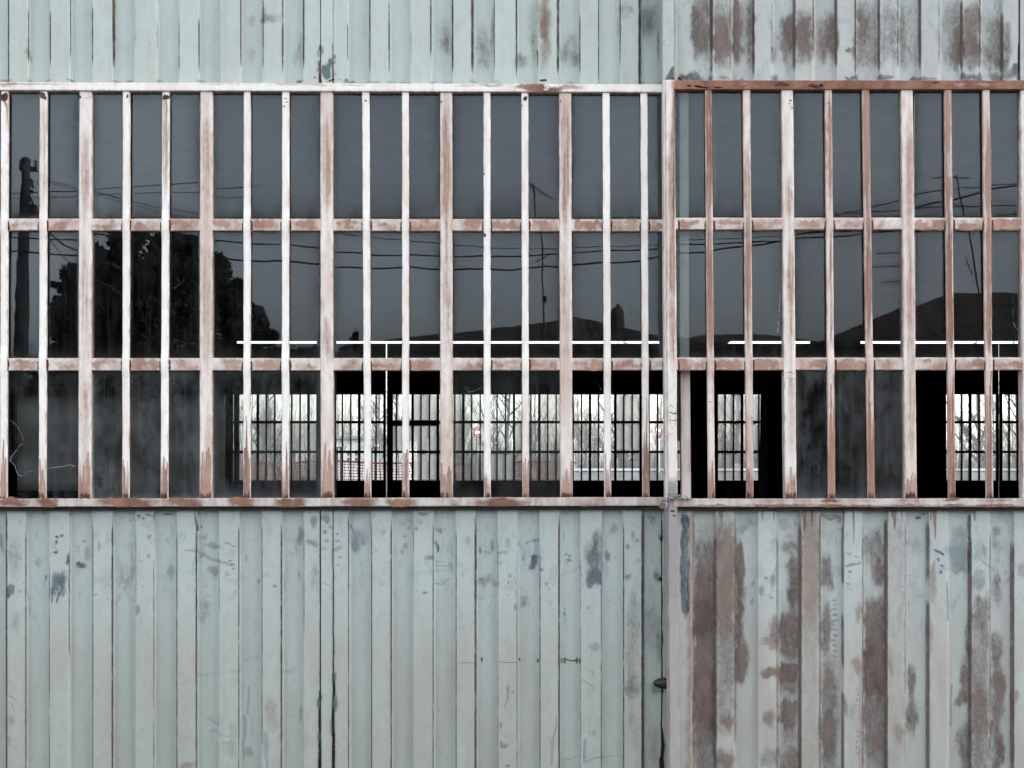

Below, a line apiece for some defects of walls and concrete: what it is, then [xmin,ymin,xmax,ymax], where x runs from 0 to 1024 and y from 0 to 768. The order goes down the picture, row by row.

rust [96,219,192,231]
rust [242,219,315,231]
rust [465,219,552,231]
rust [575,0,1024,576]
rust [7,359,49,370]
rust [92,359,198,370]
rust [225,359,292,371]
rust [344,360,432,371]
rust [747,358,917,768]
rust [687,461,748,768]
rust [957,540,1018,768]
rust [901,605,930,768]